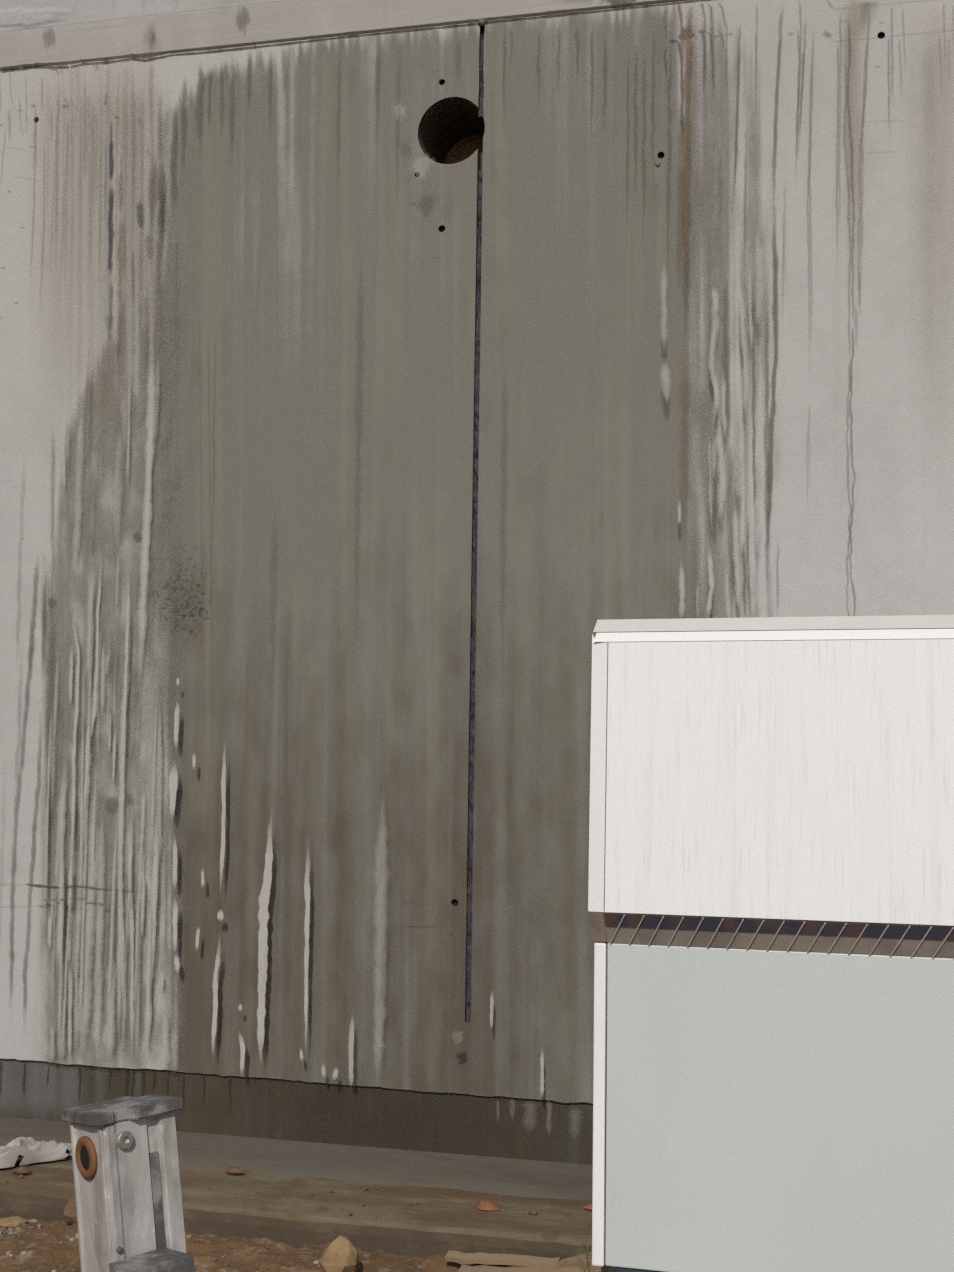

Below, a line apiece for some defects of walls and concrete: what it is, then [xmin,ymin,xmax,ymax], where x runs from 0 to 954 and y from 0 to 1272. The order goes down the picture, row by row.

leakage [10,0,778,1165]
leakage [774,15,782,153]
leakage [798,6,813,127]
crack [847,30,860,616]